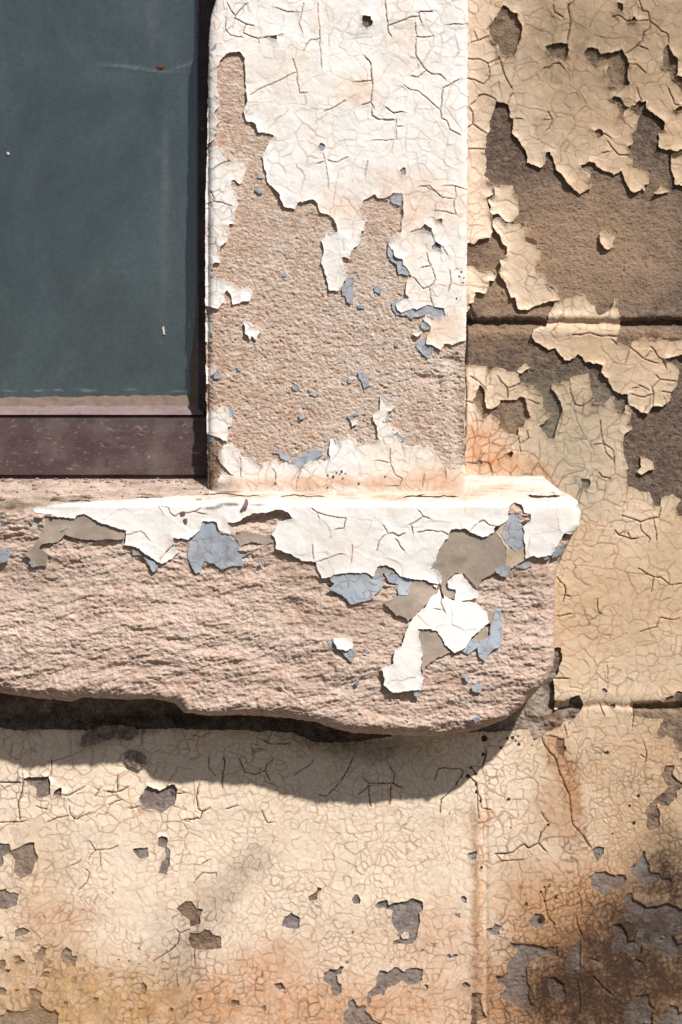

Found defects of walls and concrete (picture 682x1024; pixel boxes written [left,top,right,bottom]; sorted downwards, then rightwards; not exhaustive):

peeling [489,5,522,56]
crack [328,5,512,135]
peeling [8,42,682,697]
crack [168,468,346,529]
crack [528,492,560,500]
crack [0,777,136,889]
peeling [139,785,177,814]
crack [496,727,591,861]
peeling [176,901,221,950]
peeling [375,898,437,951]
damp [527,849,682,1024]
peeling [323,956,428,1024]